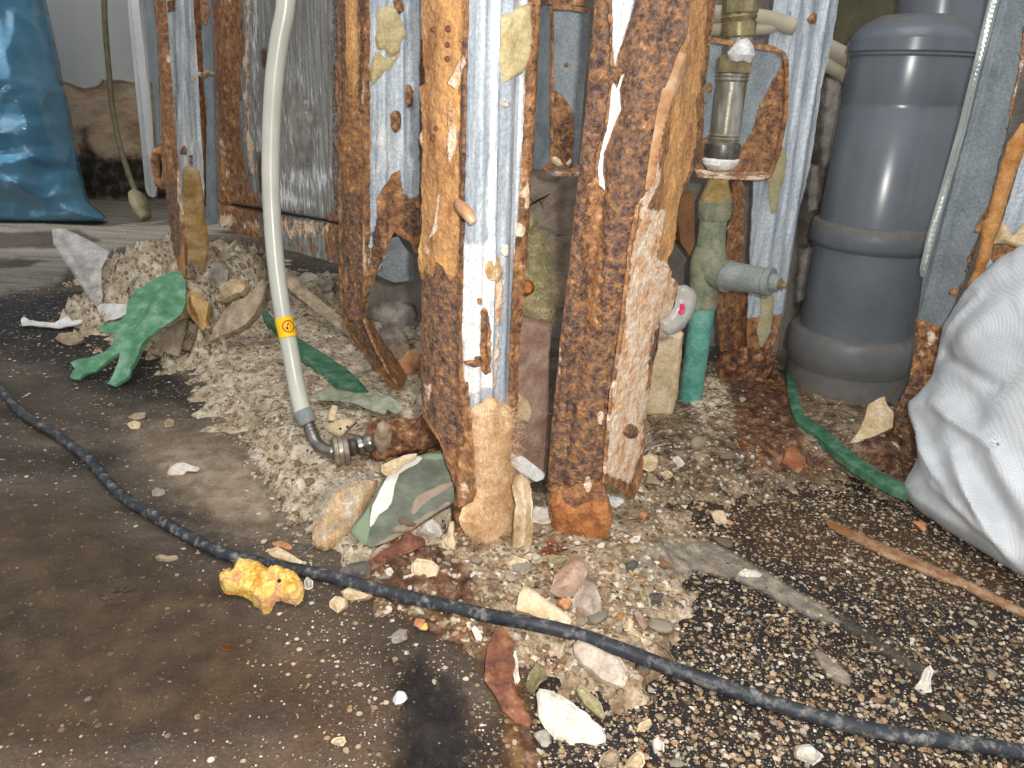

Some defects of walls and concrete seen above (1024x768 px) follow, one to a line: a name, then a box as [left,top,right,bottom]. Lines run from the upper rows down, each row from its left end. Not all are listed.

corrosion [393,0,404,14]
corrosion [390,84,413,133]
peeling [645,50,692,191]
corrosion [150,146,165,190]
corrosion [547,0,691,524]
corrosion [729,377,825,477]
corrosion [859,418,914,481]